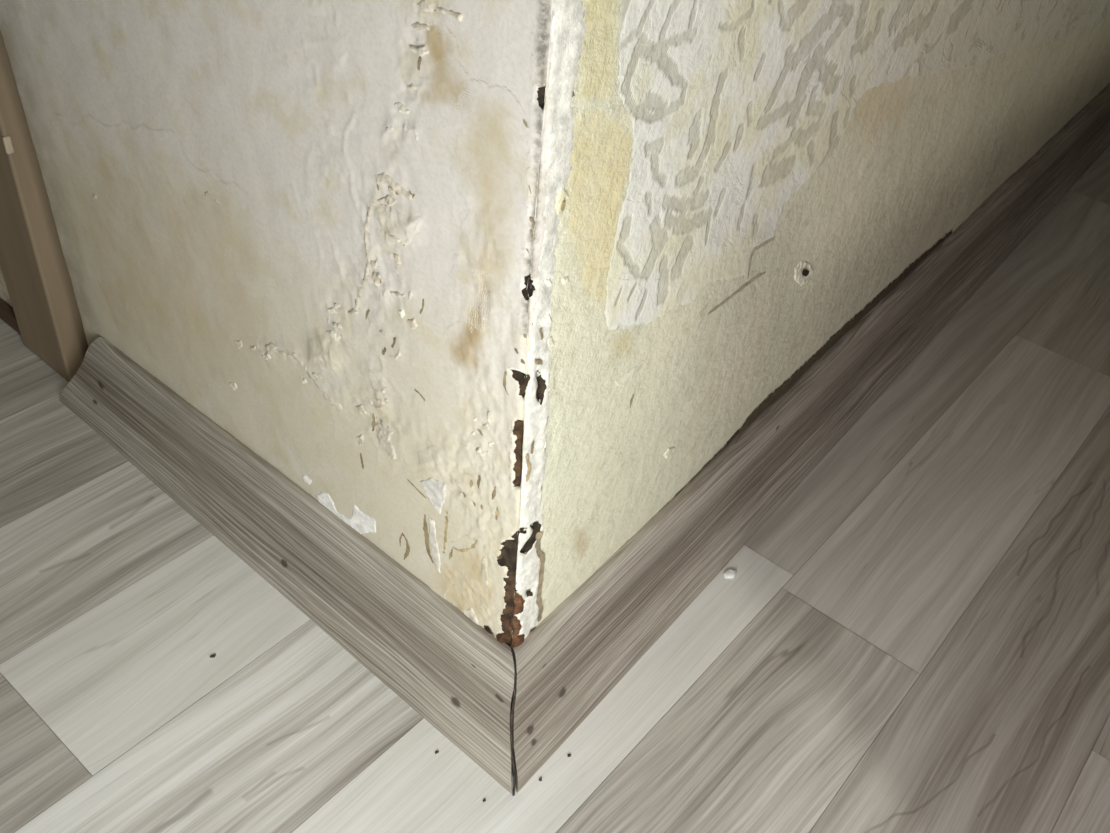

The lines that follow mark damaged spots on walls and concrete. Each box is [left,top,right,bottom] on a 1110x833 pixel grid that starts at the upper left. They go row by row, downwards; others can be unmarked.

peeling [411,0,463,30]
peeling [375,172,415,206]
damp [387,0,526,382]
damp [559,0,634,313]
peeling [371,260,418,330]
spalling [503,0,586,639]
damp [600,327,639,367]
peeling [303,475,376,534]
spalling [455,473,499,520]
peeling [463,608,479,625]
corrosion [484,528,536,652]
crack [509,647,517,796]